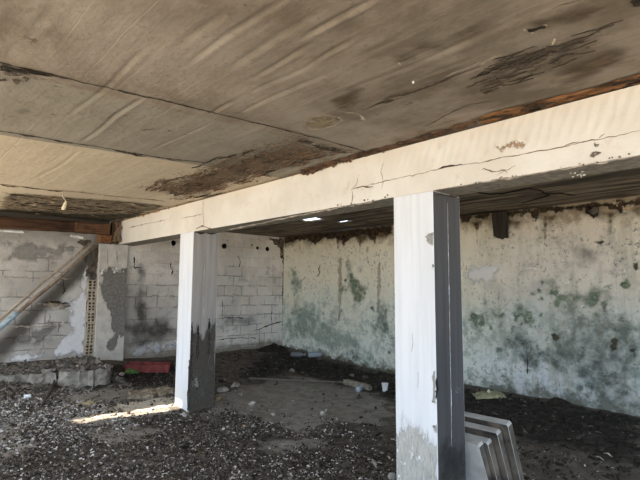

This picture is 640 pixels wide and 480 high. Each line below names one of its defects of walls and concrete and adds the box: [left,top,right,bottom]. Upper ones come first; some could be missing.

rust [291,74,640,176]
spalling [139,138,351,200]
crack [351,130,640,205]
peeling [0,193,162,221]
flaking render [500,197,640,222]
peeling [9,239,127,351]
mould [340,264,366,302]
mould [371,306,388,333]
mould [470,313,492,329]
mould [550,289,607,315]
damp [187,319,216,412]
mould [506,318,637,390]